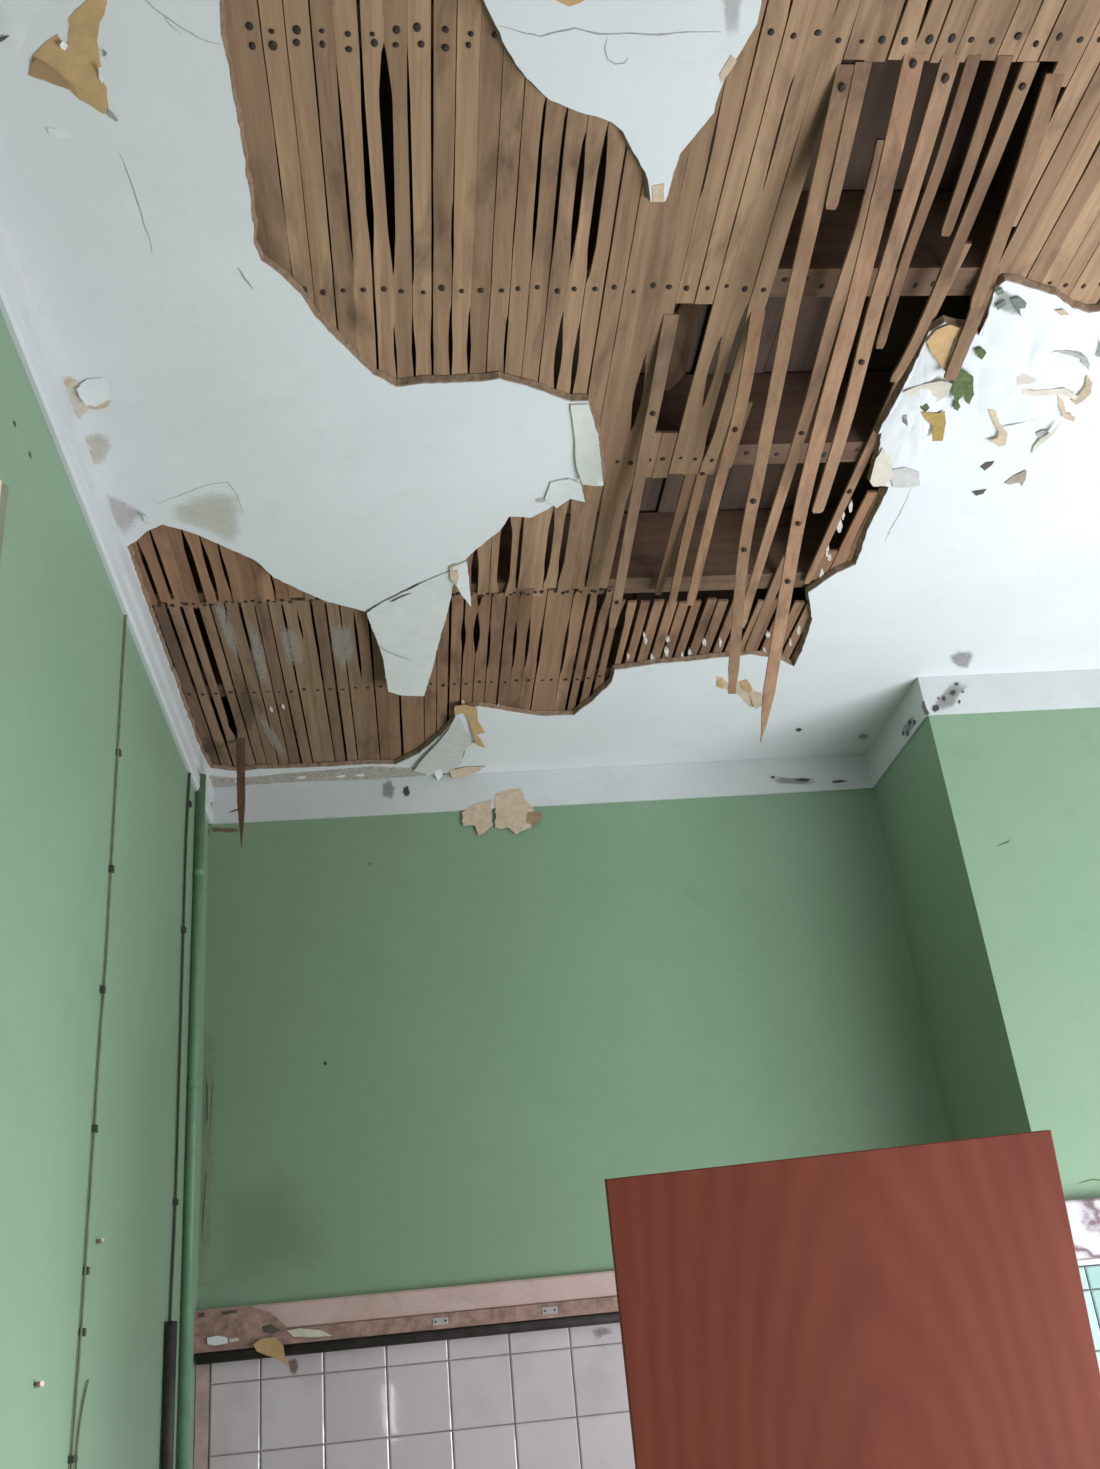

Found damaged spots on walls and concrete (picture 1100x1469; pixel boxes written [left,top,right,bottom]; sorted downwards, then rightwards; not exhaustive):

crack [145,0,221,45]
peeling [29,0,119,122]
peeling [870,324,974,488]
peeling [535,479,585,508]
peeling [1005,470,1027,486]
peeling [450,561,471,606]
peeling [716,676,762,709]
peeling [209,705,486,807]
spalling [462,789,542,836]
spalling [194,1306,333,1367]